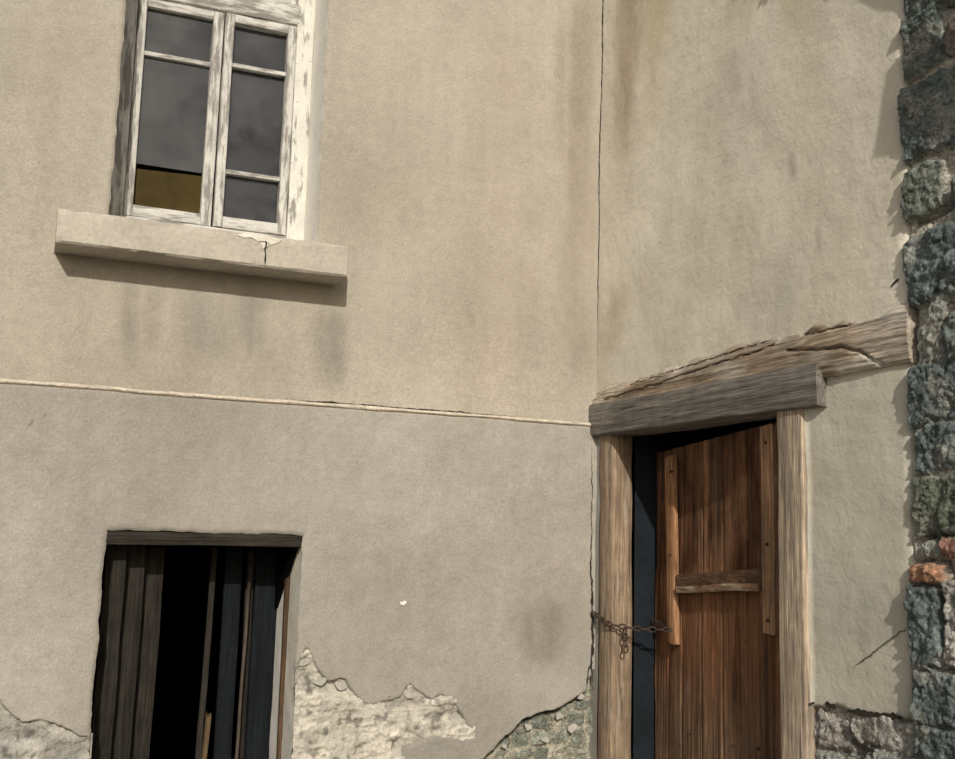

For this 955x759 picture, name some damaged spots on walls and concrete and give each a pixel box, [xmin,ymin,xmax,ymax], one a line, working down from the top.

crack [586,445,594,687]
crack [855,628,907,666]
flaking render [0,704,93,759]
flaking render [292,649,475,759]
flaking render [484,678,592,759]